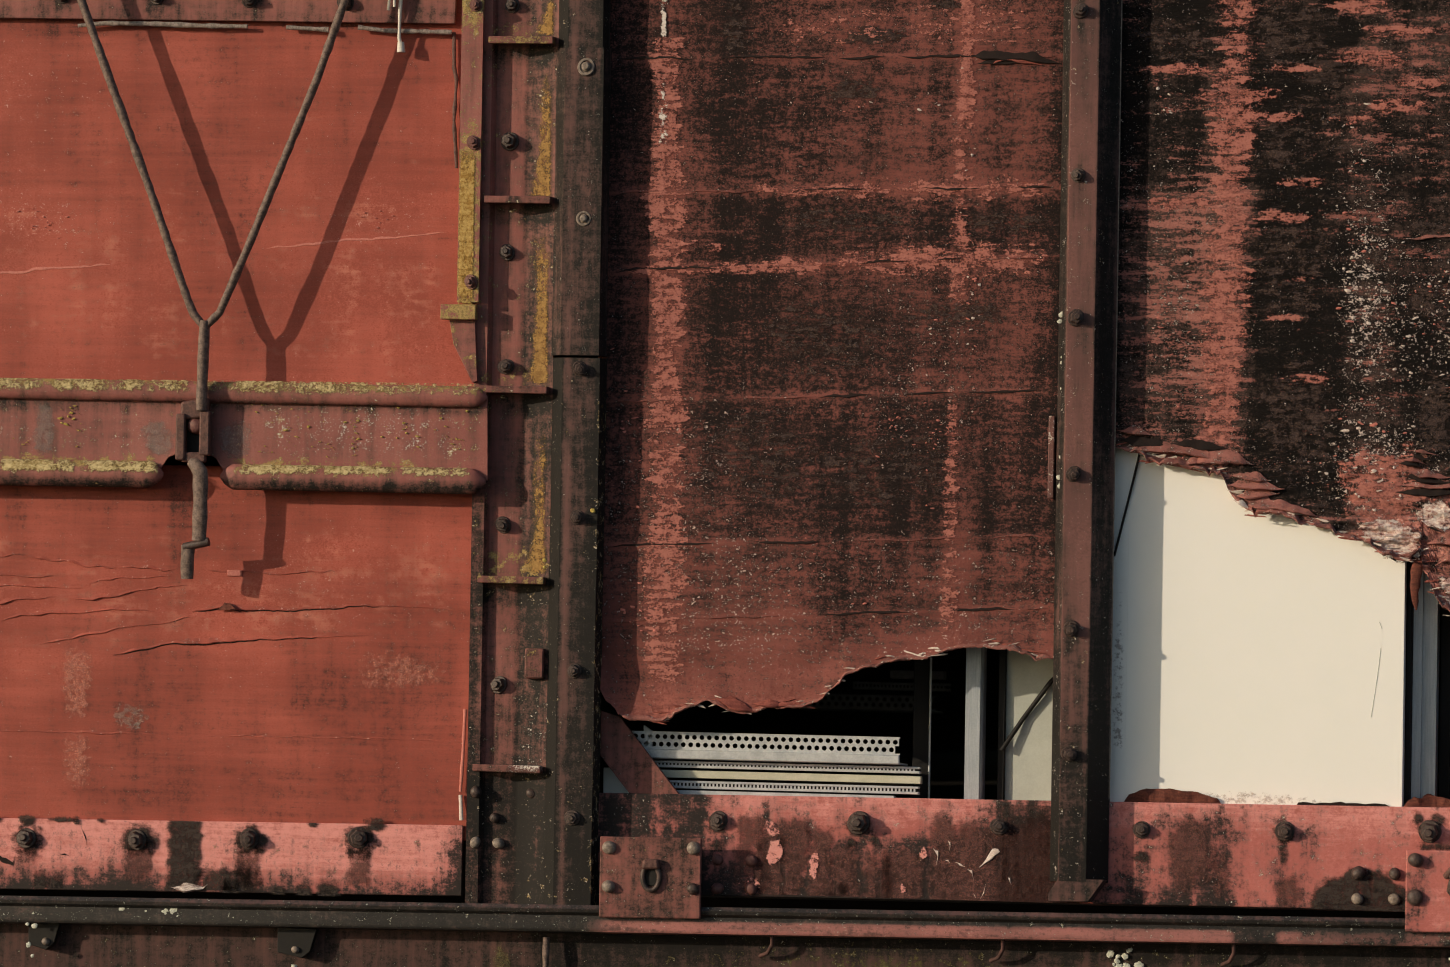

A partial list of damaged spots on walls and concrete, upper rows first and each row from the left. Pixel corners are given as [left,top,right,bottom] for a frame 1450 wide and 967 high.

peeling [1336,212,1450,386]
peeling [1117,425,1320,519]
peeling [1307,393,1450,604]
crack [0,553,451,656]
peeling [717,696,795,713]
corrosion [11,824,43,862]
corrosion [120,823,159,883]
corrosion [234,824,269,889]
corrosion [345,826,378,885]
corrosion [1132,822,1149,862]
corrosion [1272,828,1295,863]
corrosion [1413,813,1450,851]